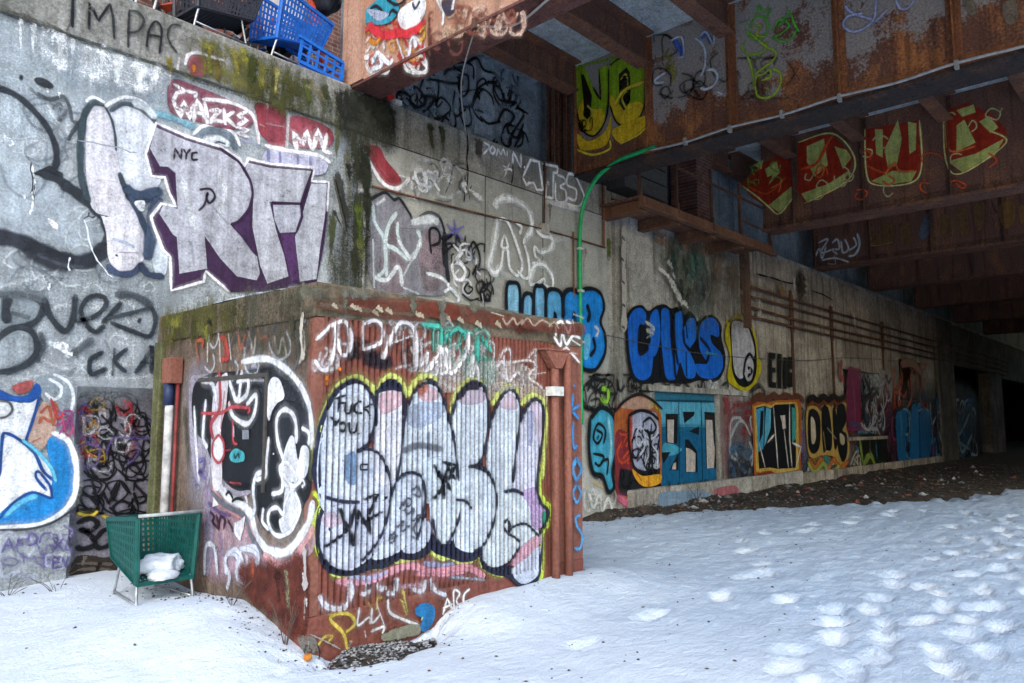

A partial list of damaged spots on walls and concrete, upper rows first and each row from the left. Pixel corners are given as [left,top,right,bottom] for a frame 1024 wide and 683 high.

water stain [204,43,280,92]
water stain [302,77,399,265]